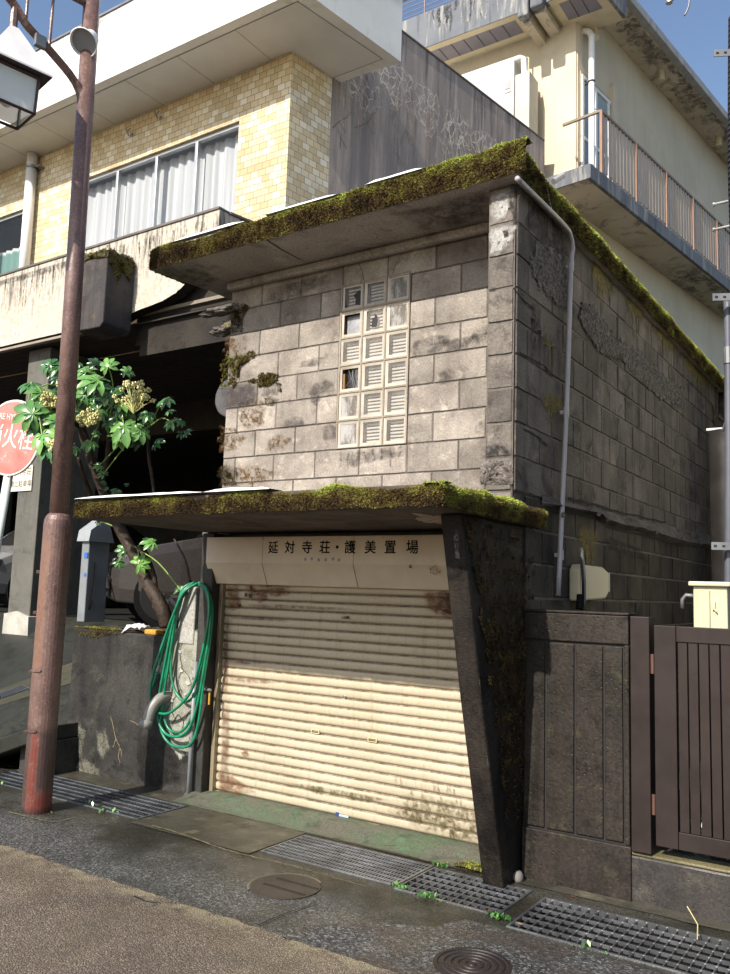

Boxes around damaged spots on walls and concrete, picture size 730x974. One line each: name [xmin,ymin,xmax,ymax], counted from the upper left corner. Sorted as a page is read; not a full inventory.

spalling [199,304,232,337]
rust [228,585,294,620]
rust [427,593,451,616]
rust [220,775,243,794]